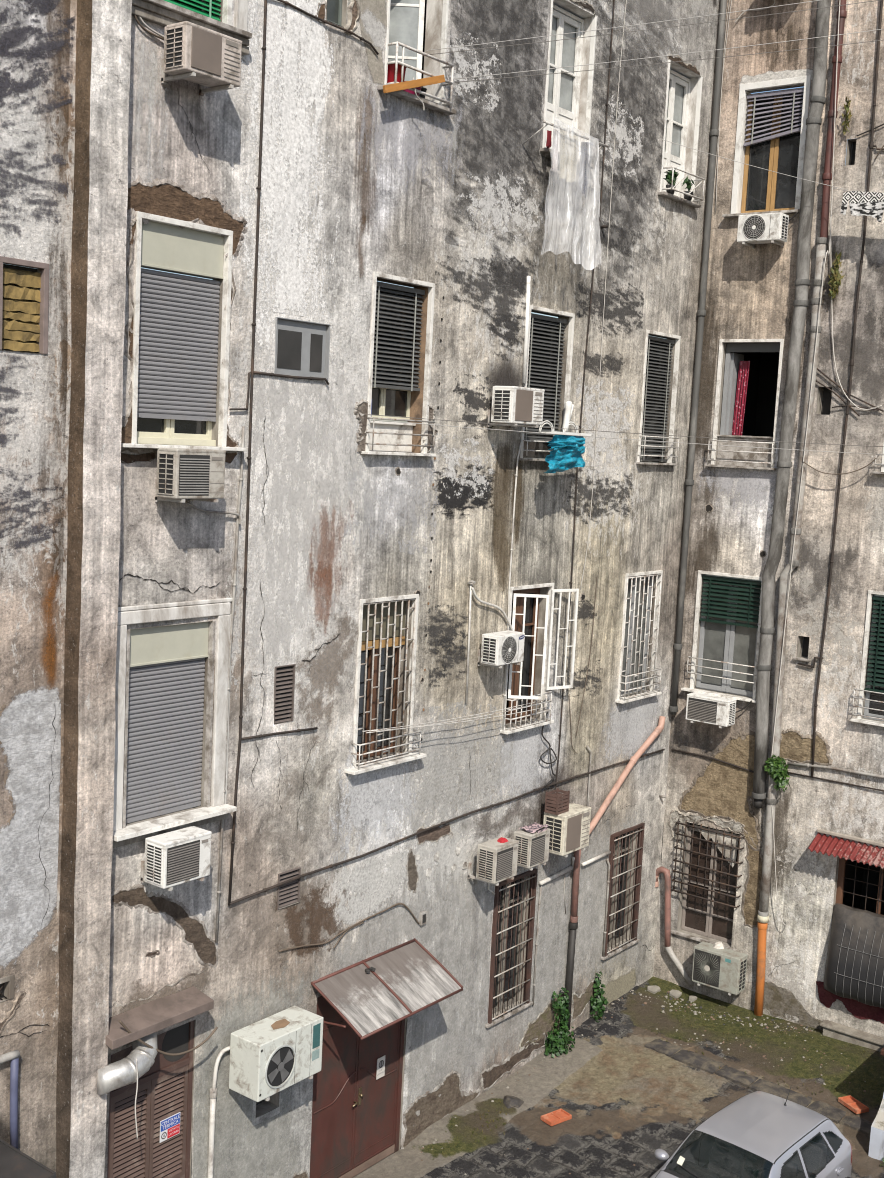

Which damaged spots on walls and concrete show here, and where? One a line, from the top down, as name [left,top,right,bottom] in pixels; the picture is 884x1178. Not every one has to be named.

damp [430,0,687,360]
corrosion [50,260,68,426]
flaking render [121,175,248,464]
damp [432,374,524,591]
damp [566,351,635,524]
corrosion [42,514,63,681]
crack [119,573,220,593]
damp [420,605,469,687]
flaking render [678,730,821,928]
flaking render [779,728,833,766]
peeling [109,884,219,1012]
flaking render [400,978,599,1149]